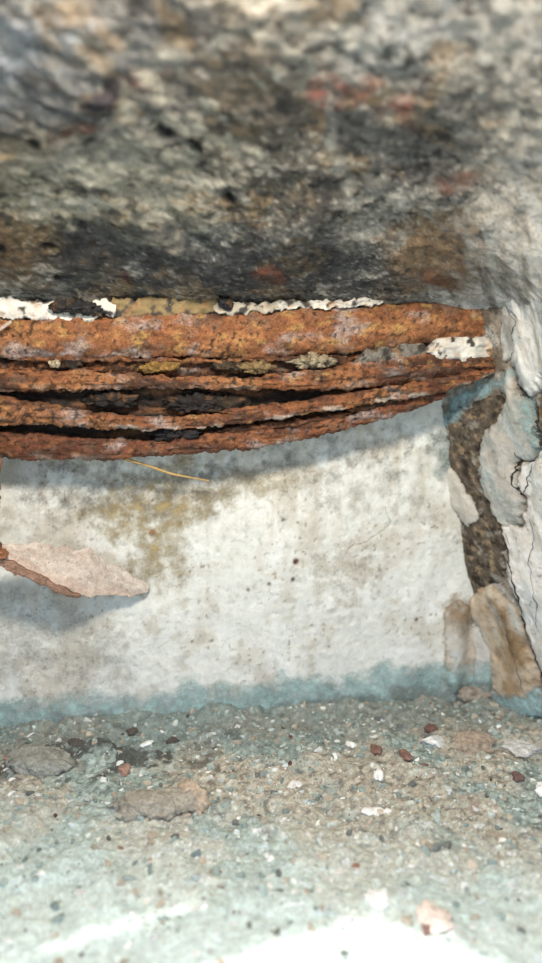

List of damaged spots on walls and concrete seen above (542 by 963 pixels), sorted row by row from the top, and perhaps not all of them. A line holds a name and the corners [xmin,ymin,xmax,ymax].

damp [146,73,170,103]
damp [51,115,373,296]
corrosion [0,301,496,461]
crack [506,307,542,497]
spalling [446,306,542,700]
crack [495,522,542,693]